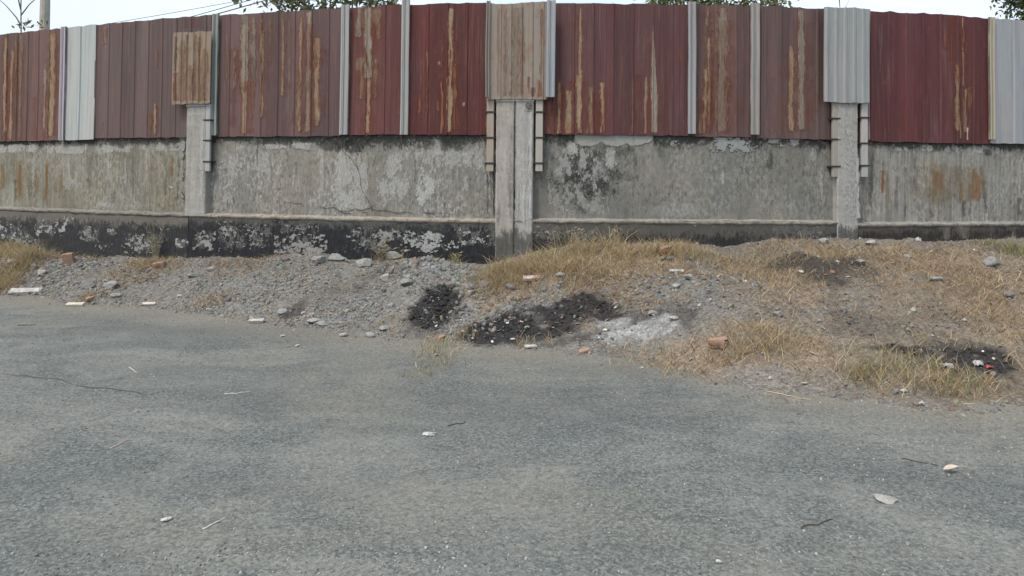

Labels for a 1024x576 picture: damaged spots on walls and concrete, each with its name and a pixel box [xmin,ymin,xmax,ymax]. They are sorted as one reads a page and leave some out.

rust [280,11,322,132]
rust [355,7,382,134]
rust [418,8,465,134]
rust [527,7,605,134]
rust [643,29,659,134]
rust [698,7,732,134]
rust [786,9,806,132]
peeling [0,216,167,269]
peeling [175,220,328,255]
crack [289,154,453,215]
leakage [545,134,630,214]
leakage [653,125,860,240]